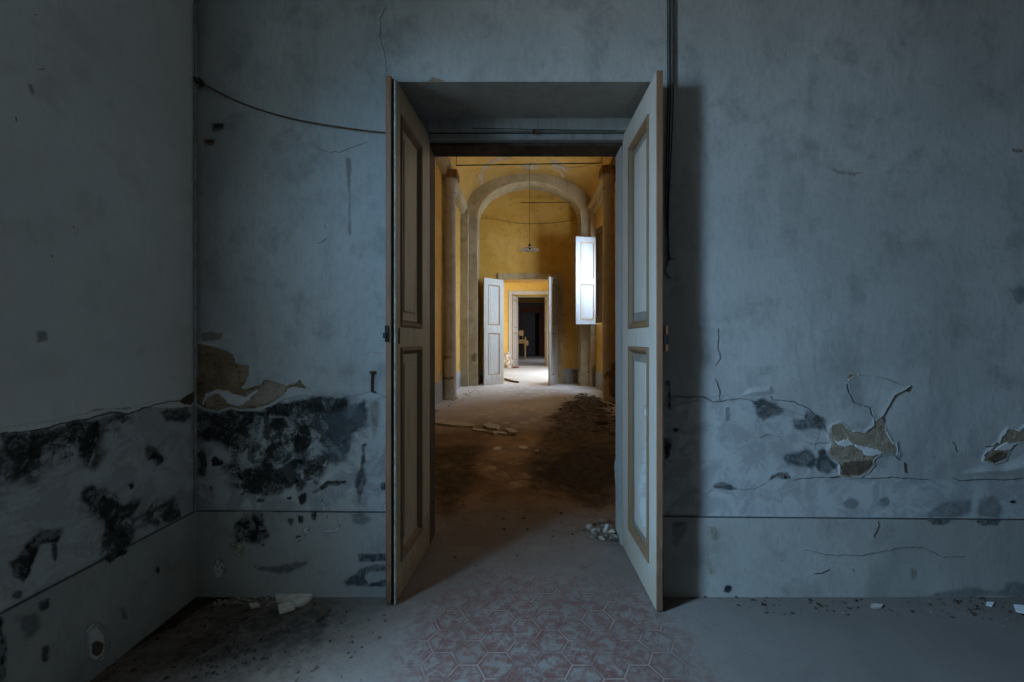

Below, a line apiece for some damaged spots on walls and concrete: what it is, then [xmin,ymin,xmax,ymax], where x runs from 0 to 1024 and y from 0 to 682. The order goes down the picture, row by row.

spalling [0,332,312,434]
crack [674,336,830,444]
water stain [663,380,1024,535]
spalling [825,380,904,480]
crack [797,431,1024,481]
spalling [981,424,1024,466]
water stain [0,392,386,680]
crack [809,522,965,574]